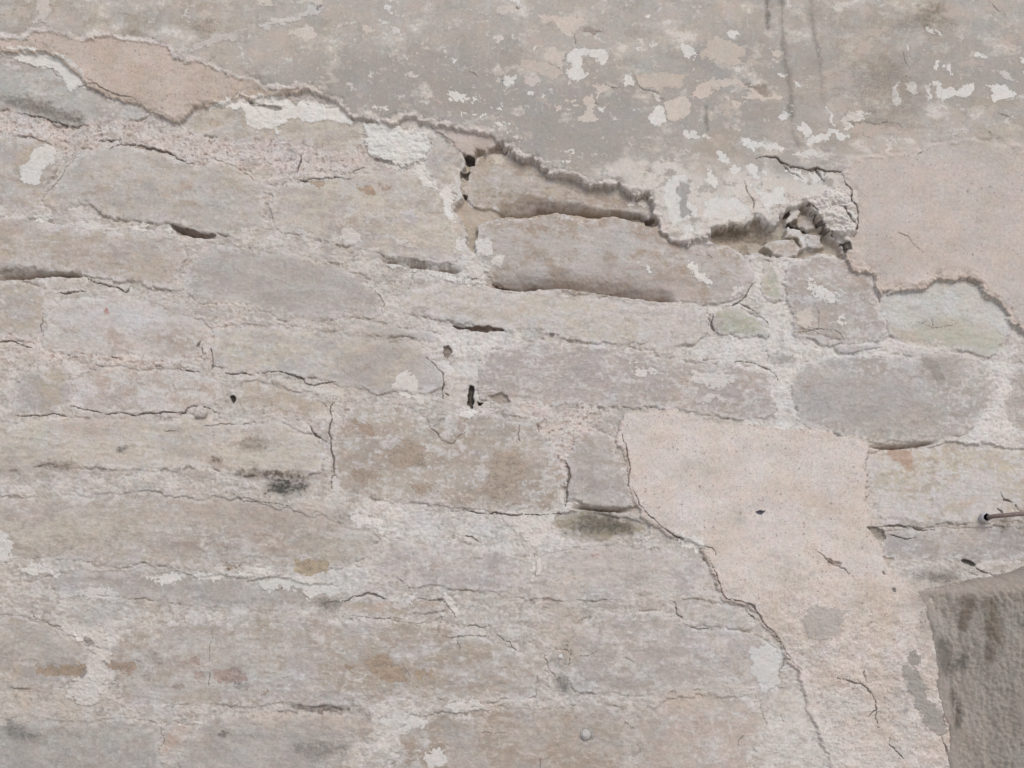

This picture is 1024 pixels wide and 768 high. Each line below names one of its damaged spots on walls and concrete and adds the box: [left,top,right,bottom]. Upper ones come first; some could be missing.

peeling [288,23,317,42]
spalling [0,48,107,96]
peeling [891,56,1024,106]
spalling [121,93,255,124]
peeling [335,13,904,242]
peeling [19,144,58,186]
crack [765,156,859,238]
crack [17,406,248,432]
crack [156,341,335,488]
crack [622,434,681,538]
crack [708,547,784,647]